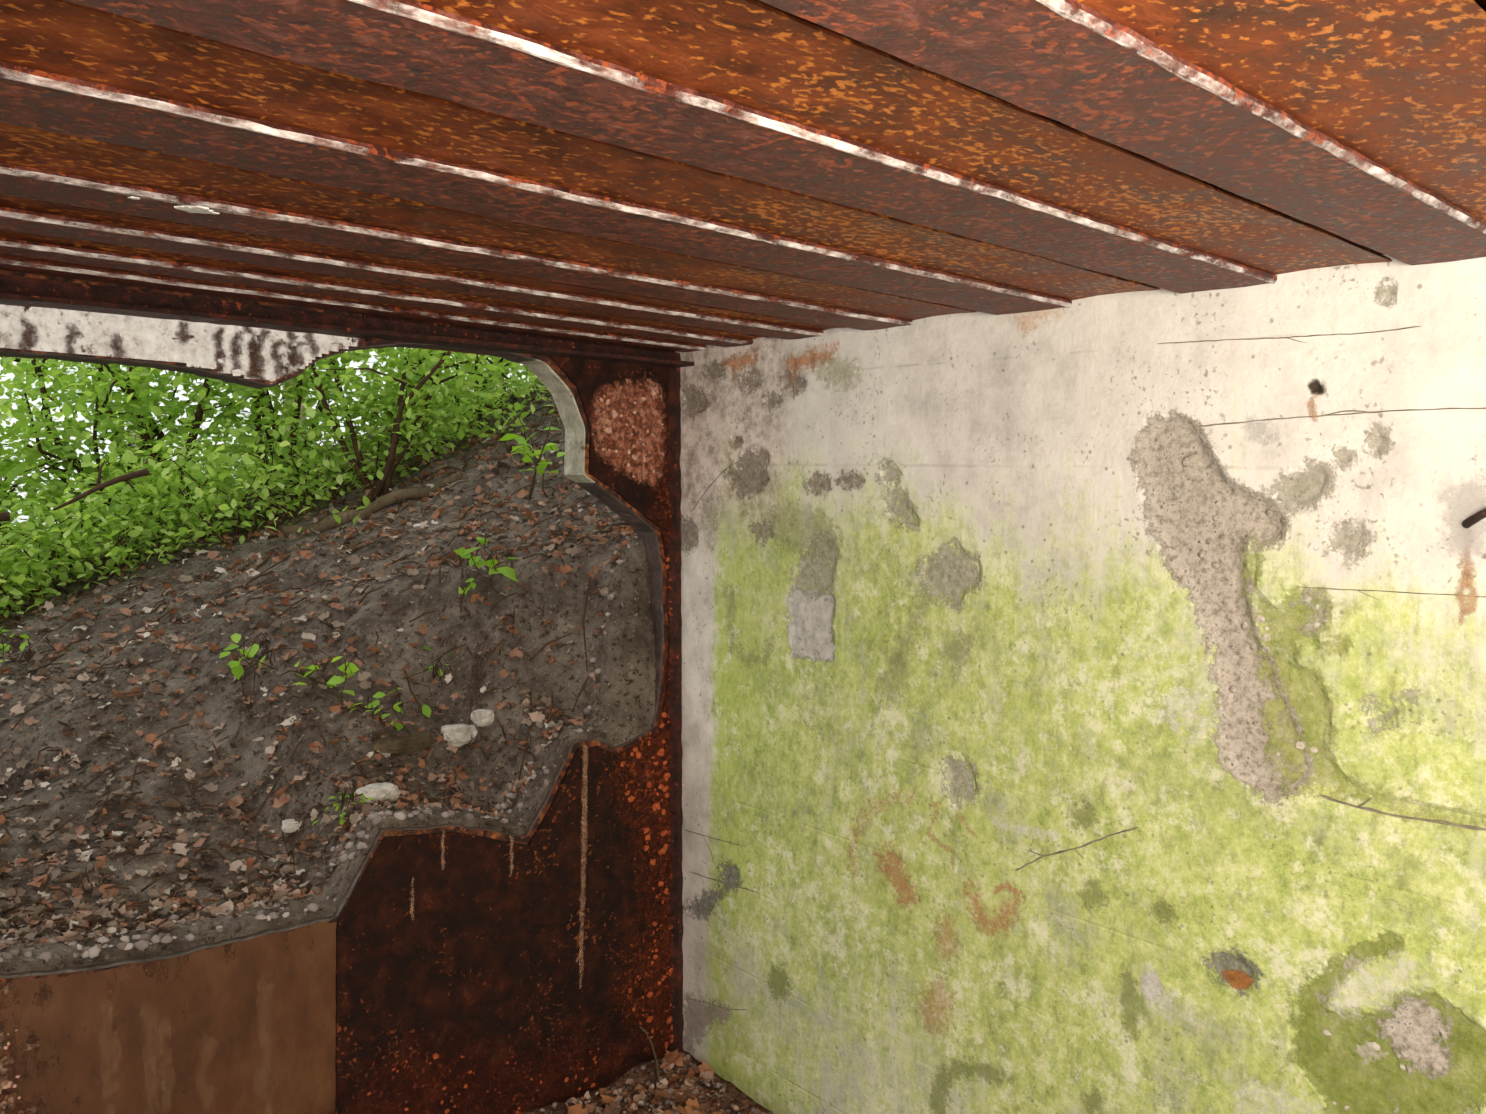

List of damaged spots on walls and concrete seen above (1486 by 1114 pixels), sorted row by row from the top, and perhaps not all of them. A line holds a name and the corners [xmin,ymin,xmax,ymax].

water stain [1444,484,1486,550]
spalling [1130,411,1484,827]
corrosion [614,353,684,1056]
water stain [1073,800,1096,830]
water stain [1080,881,1109,910]
corrosion [0,831,622,1114]
water stain [768,964,793,1000]
water stain [1141,972,1175,1009]
water stain [683,994,730,1053]
water stain [930,1062,1013,1114]